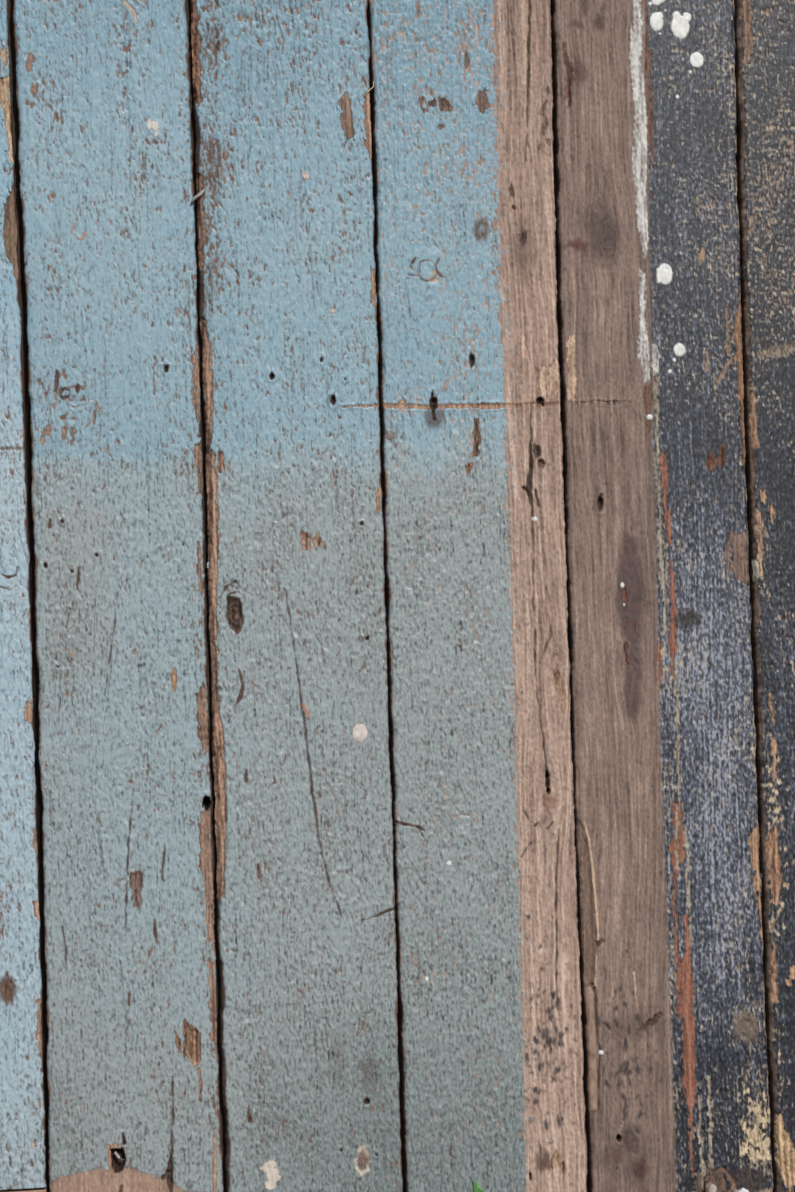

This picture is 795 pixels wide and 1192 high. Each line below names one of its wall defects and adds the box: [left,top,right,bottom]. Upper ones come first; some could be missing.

peeling [0,47,13,165]
peeling [337,88,372,158]
peeling [0,184,19,283]
peeling [196,174,206,270]
peeling [705,298,759,466]
peeling [191,318,244,943]
crack [522,412,552,777]
peeling [657,561,678,682]
spalling [130,870,143,908]
spalling [174,960,217,1101]
peeling [669,802,737,1192]
peeling [740,1088,795,1192]